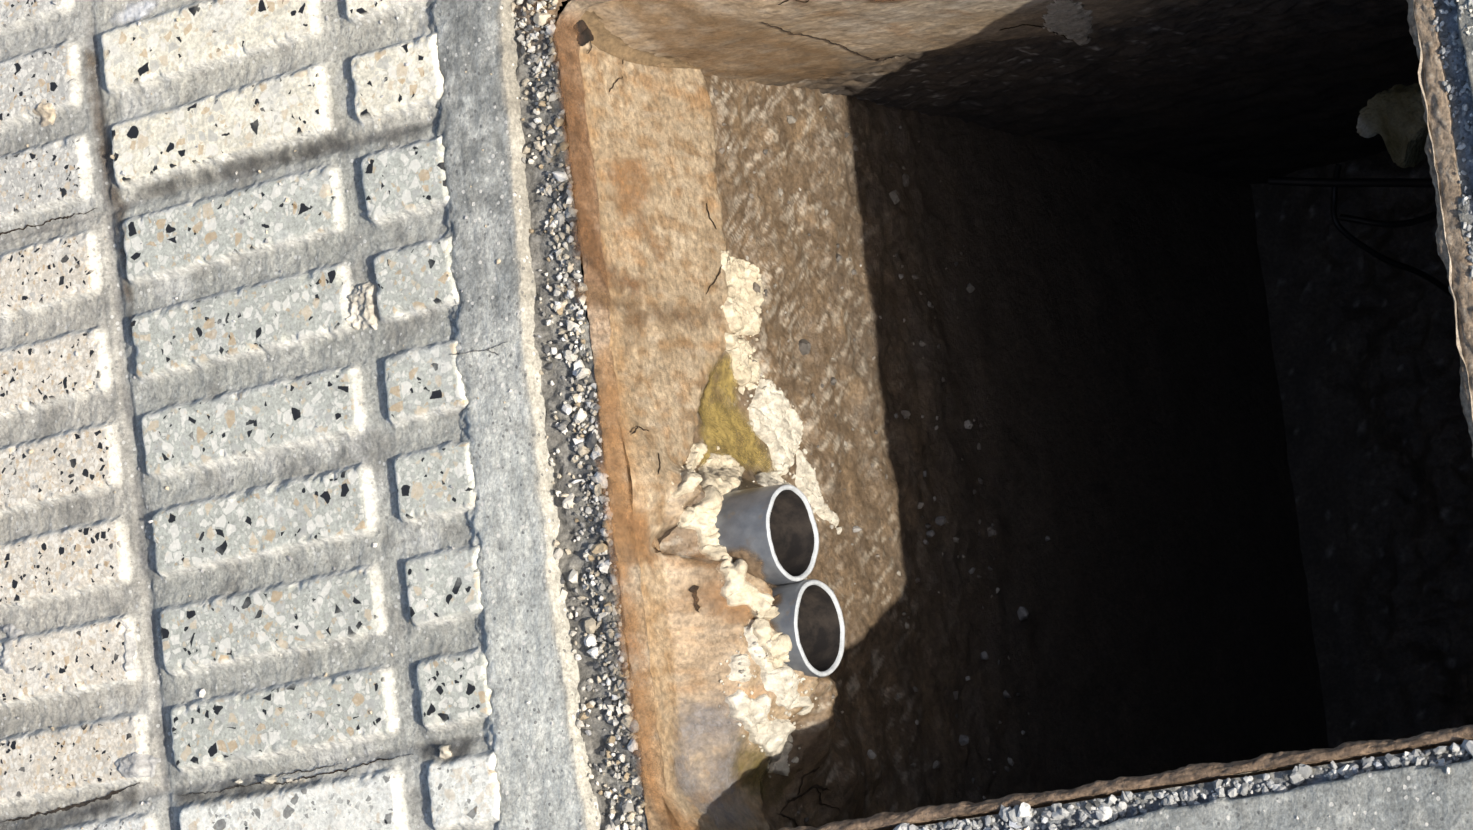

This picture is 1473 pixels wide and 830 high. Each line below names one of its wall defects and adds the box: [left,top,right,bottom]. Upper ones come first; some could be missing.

crack [761,0,904,61]
crack [1000,0,1067,39]
crack [0,208,96,235]
spalling [555,0,1473,830]
crack [189,754,414,794]
crack [1,782,140,823]